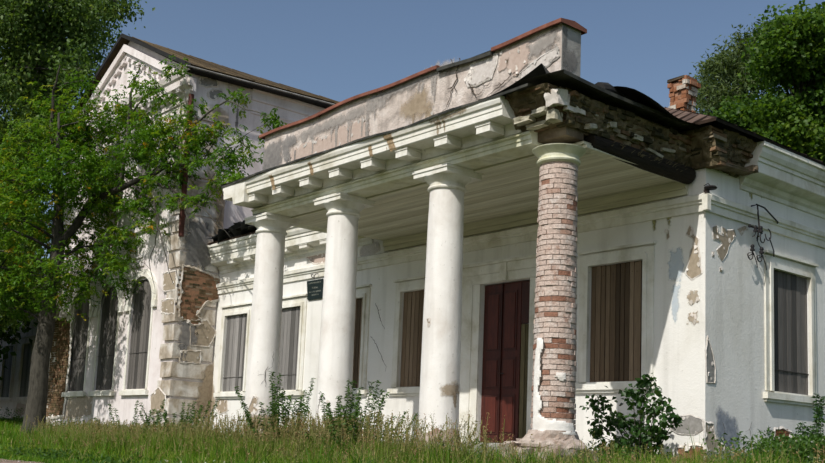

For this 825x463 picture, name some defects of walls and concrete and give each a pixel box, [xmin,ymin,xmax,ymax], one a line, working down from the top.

crack [442,58,515,112]
peeling [464,42,560,87]
peeling [290,118,369,161]
spalling [508,82,722,169]
peeling [685,225,703,281]
peeling [711,224,748,272]
spalling [160,264,220,365]
peeling [687,290,700,326]
spalling [705,335,716,384]
spalling [675,420,725,462]
spalling [773,426,792,441]